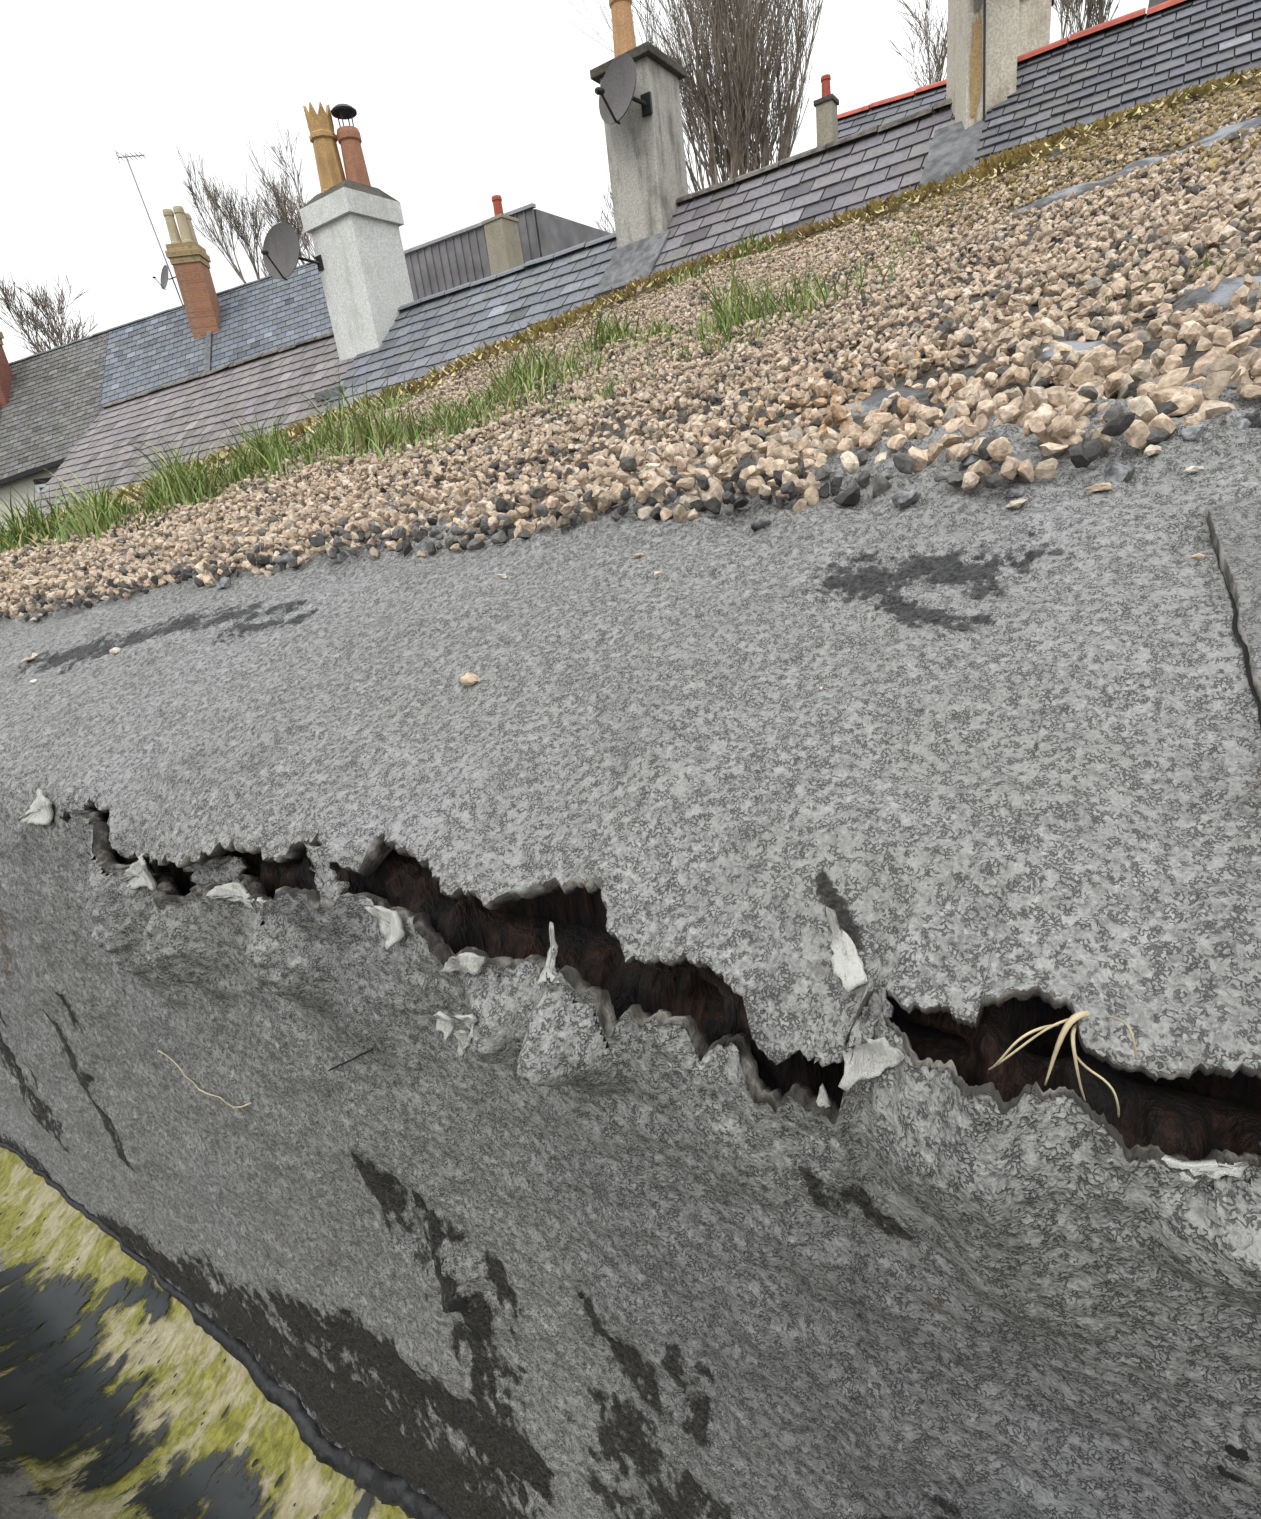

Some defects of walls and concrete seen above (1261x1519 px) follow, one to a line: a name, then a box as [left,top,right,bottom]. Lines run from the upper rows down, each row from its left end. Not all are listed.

crack [1213,547,1261,728]
crack [815,868,868,974]
leakage [0,1130,58,1184]
leakage [0,1012,70,1153]
leakage [43,991,135,1172]
crack [794,1164,916,1241]
leakage [0,1152,554,1519]
leakage [568,1291,730,1519]